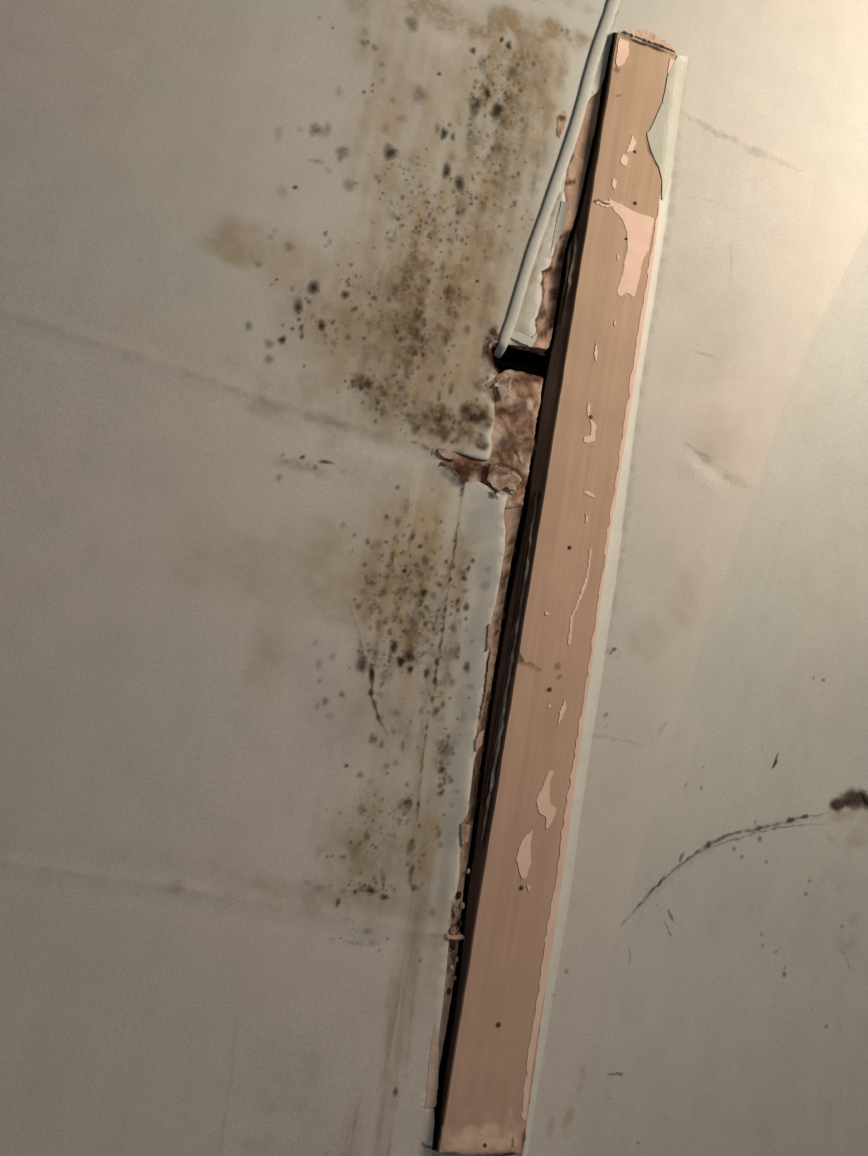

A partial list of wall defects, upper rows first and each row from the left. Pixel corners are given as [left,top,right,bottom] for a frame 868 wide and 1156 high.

water stain [457,8,558,150]
peeling [620,135,636,166]
water stain [280,283,318,342]
water stain [339,152,515,442]
water stain [367,503,474,683]
spalling [425,82,603,1108]
spalling [521,178,660,1120]
spalling [831,789,868,810]